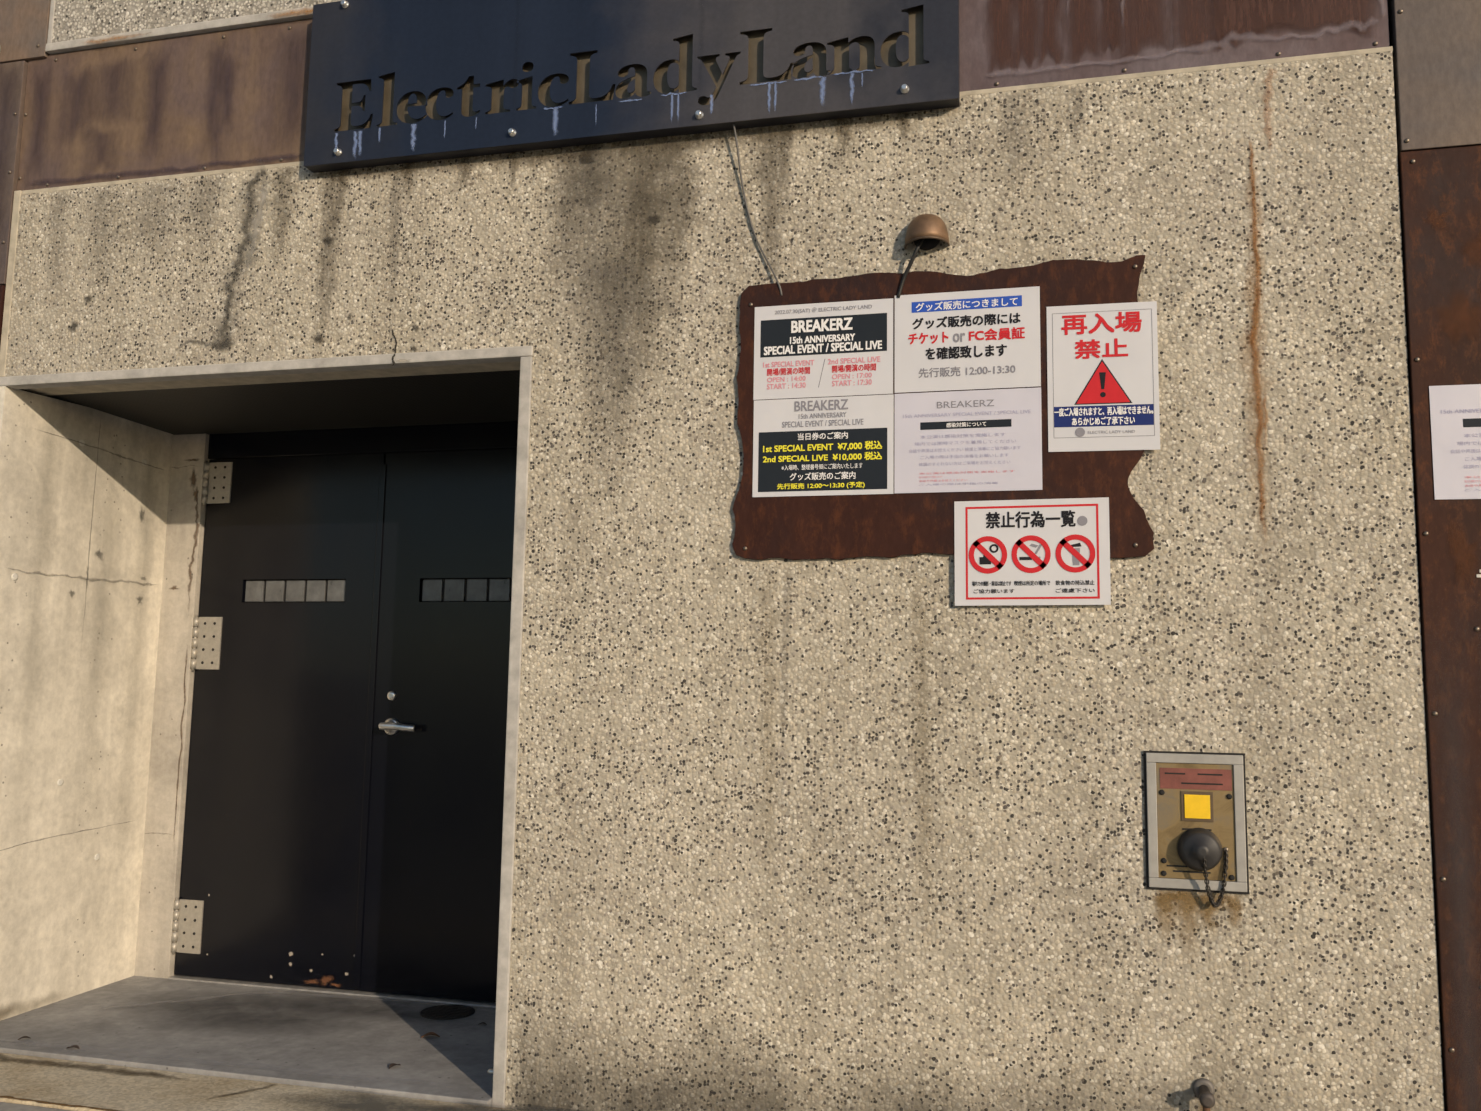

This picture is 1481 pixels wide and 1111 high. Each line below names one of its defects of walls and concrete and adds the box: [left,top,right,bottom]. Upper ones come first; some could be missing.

corrosion [1250,148,1267,512]